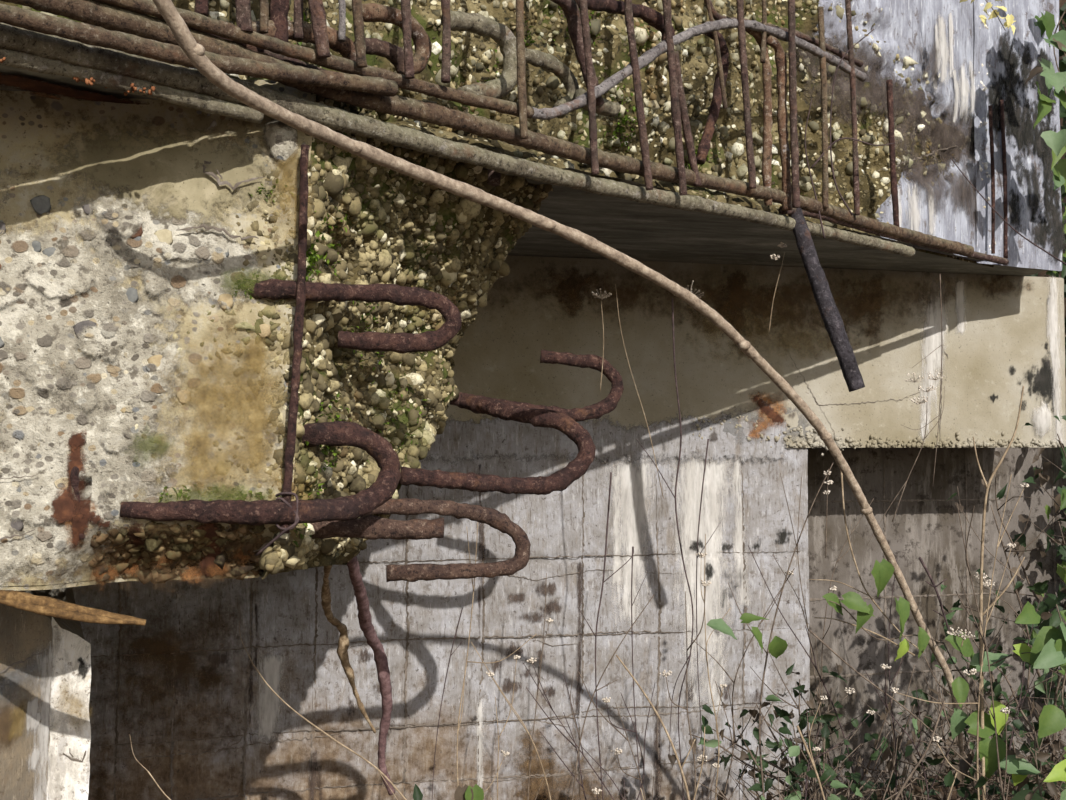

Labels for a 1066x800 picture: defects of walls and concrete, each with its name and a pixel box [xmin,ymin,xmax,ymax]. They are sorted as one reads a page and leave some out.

spalling [208,0,236,24]
spalling [323,0,393,40]
spalling [420,0,584,88]
efflorescence [933,13,975,122]
spalling [557,0,990,224]
damp [898,186,936,235]
damp [539,272,824,348]
spalling [0,128,632,589]
corrosion [749,391,784,438]
corrosion [51,431,110,548]
corrosion [93,521,268,580]
damp [517,737,624,800]